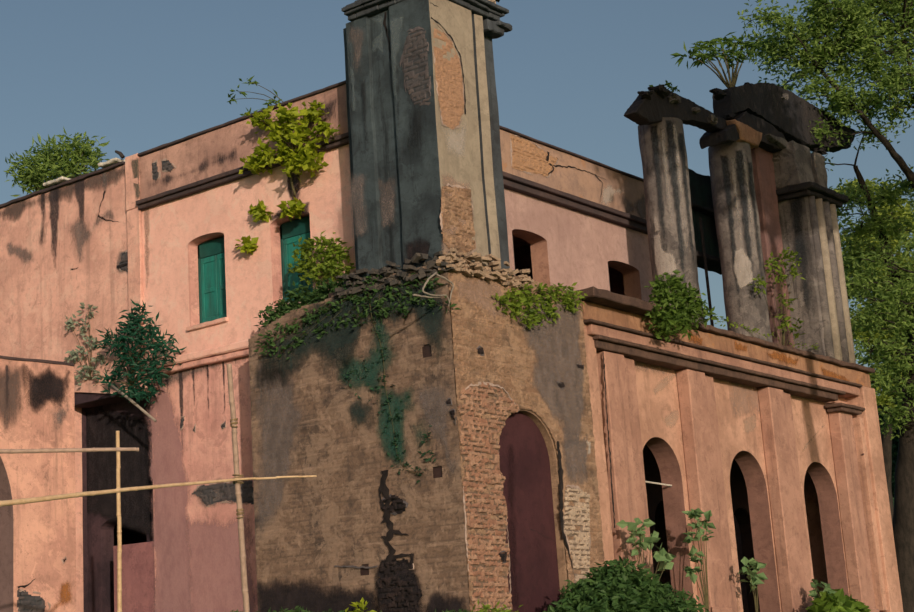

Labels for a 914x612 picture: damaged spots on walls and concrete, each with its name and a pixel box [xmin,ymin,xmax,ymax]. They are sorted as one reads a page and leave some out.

water stain [310,100,336,124]
peeling [372,18,403,94]
spalling [433,23,465,130]
water stain [199,151,235,171]
spalling [510,135,559,178]
water stain [40,189,59,256]
water stain [71,180,90,258]
spalling [440,177,477,256]
water stain [0,365,69,428]
water stain [86,359,379,612]
spalling [446,381,520,612]
spalling [563,485,591,583]